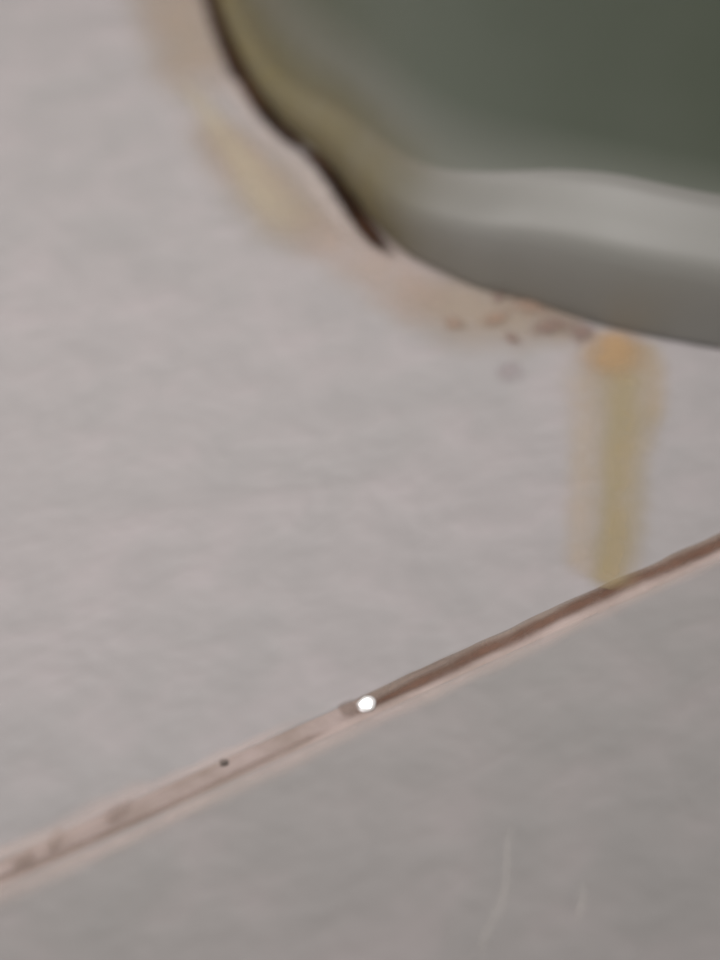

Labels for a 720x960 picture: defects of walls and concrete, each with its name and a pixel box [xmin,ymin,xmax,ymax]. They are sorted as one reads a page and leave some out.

water stain [217,0,384,232]